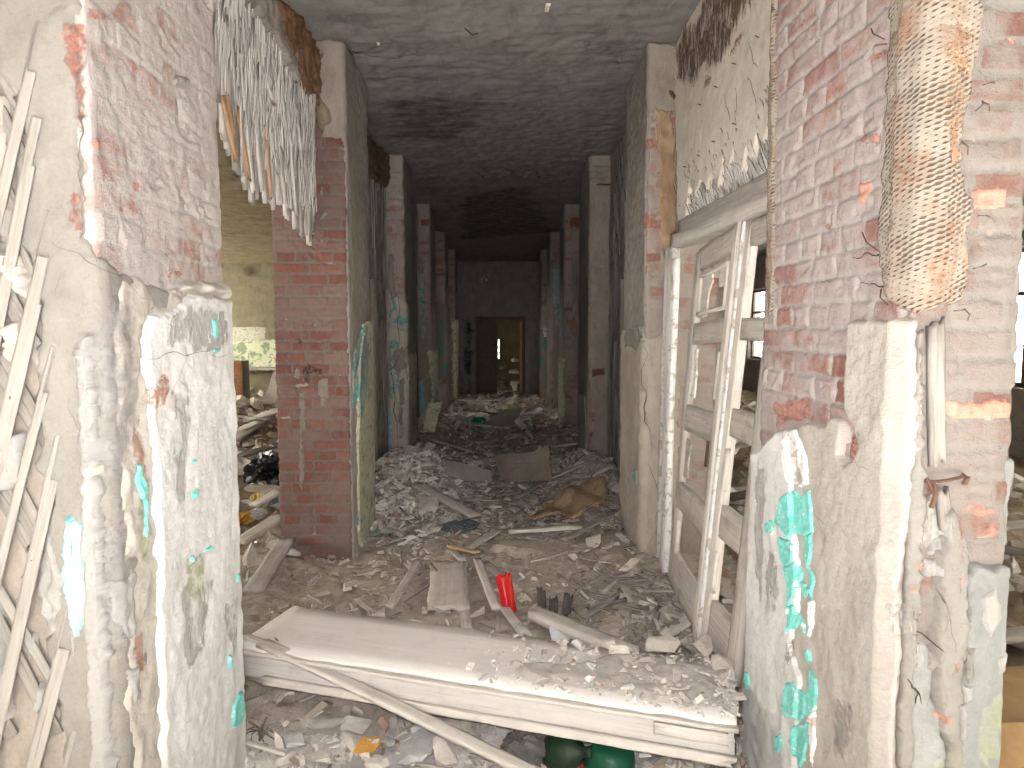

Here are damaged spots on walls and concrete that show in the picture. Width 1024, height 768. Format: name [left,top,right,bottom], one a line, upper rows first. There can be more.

flaking render [245,0,305,84]
water stain [367,135,391,189]
flaking render [972,186,1007,209]
peeling [388,253,426,451]
flaking render [945,399,1011,420]
peeling [135,463,149,537]
peeling [38,516,138,655]
peeling [764,397,818,768]
peeling [918,558,944,577]
peeling [981,586,1002,637]
peeling [998,652,1008,674]
peeling [231,691,246,729]